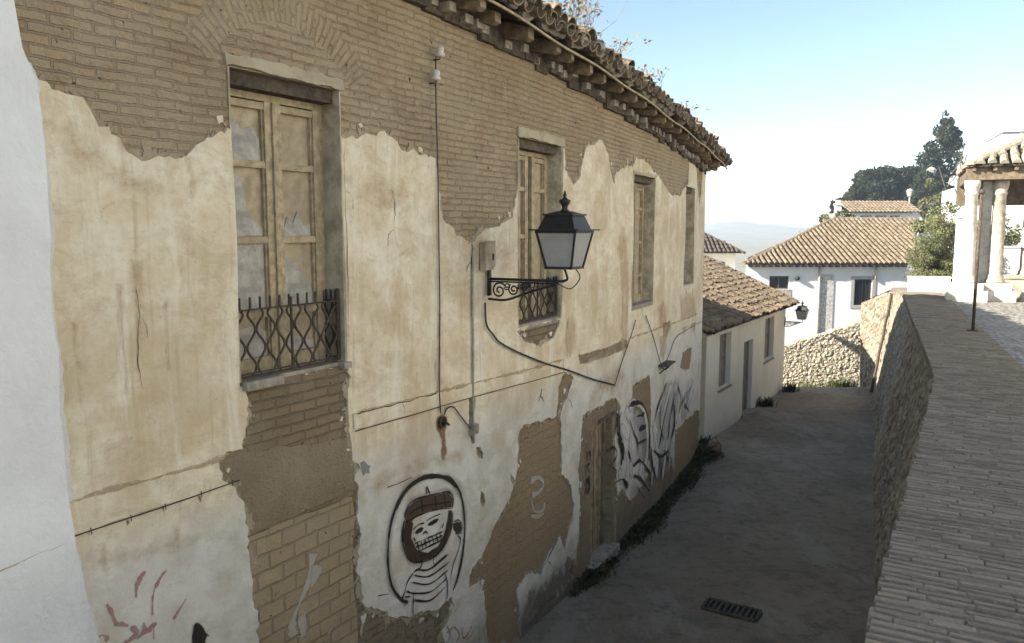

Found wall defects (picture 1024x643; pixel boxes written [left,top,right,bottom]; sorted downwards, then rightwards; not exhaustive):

spalling [14,0,702,243]
crack [136,290,148,384]
spalling [219,366,453,643]
corrosion [436,415,447,459]
spalling [517,322,559,347]
spalling [469,372,699,643]